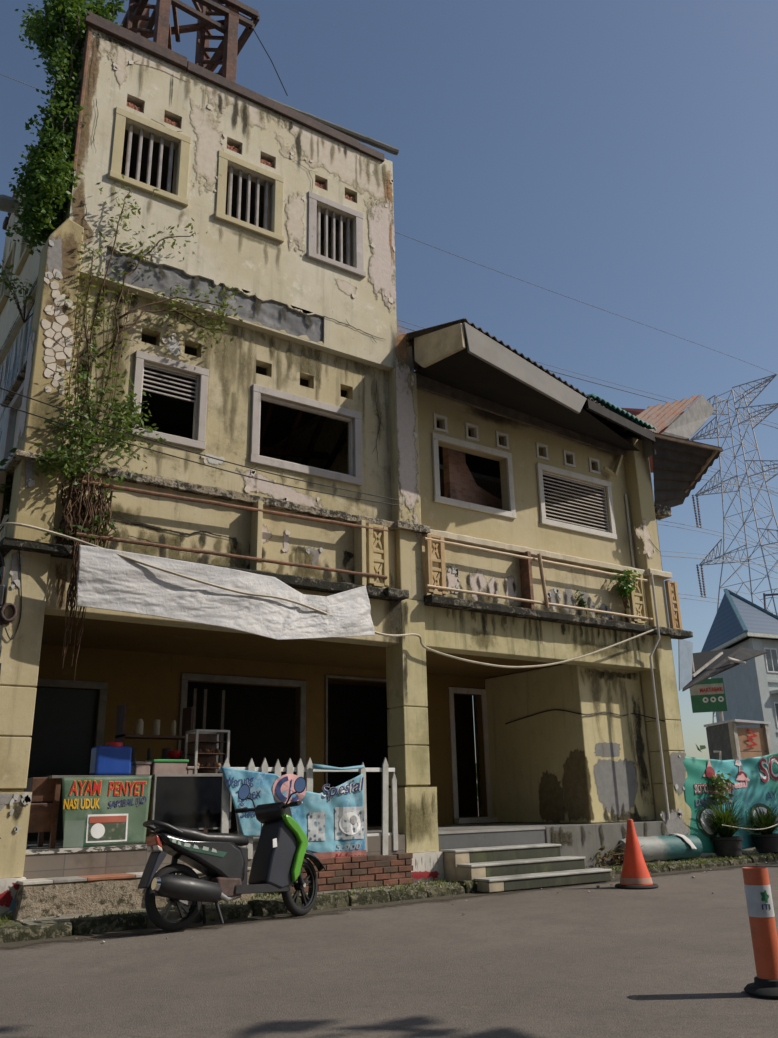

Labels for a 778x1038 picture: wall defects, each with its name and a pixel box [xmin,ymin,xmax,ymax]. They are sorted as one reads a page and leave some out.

damp [96,34,162,89]
damp [171,74,387,185]
peeling [92,35,396,313]
spalling [105,246,324,345]
peeling [201,453,225,465]
peeling [236,468,327,509]
peeling [395,357,420,538]
damp [91,504,355,584]
damp [368,571,408,642]
damp [447,609,543,649]
damp [539,624,650,846]
spalling [0,792,32,833]